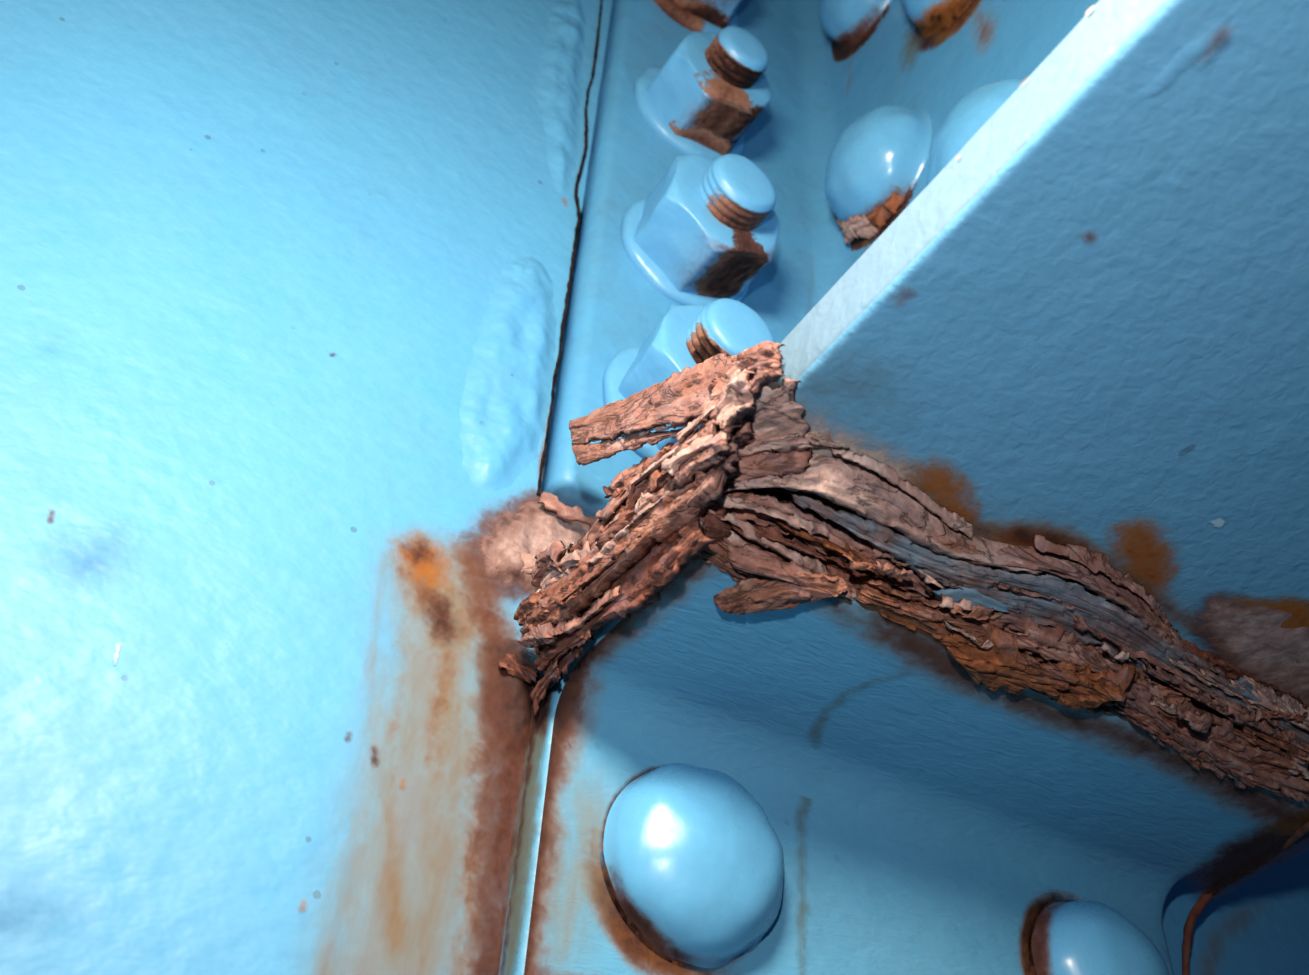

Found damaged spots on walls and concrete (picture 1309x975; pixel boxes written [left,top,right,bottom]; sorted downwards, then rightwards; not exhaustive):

rust [653,0,766,156]
rust [830,3,889,62]
rust [906,0,980,61]
crack [536,0,603,496]
rust [694,194,772,299]
rust [839,183,916,251]
rust [400,323,1309,975]